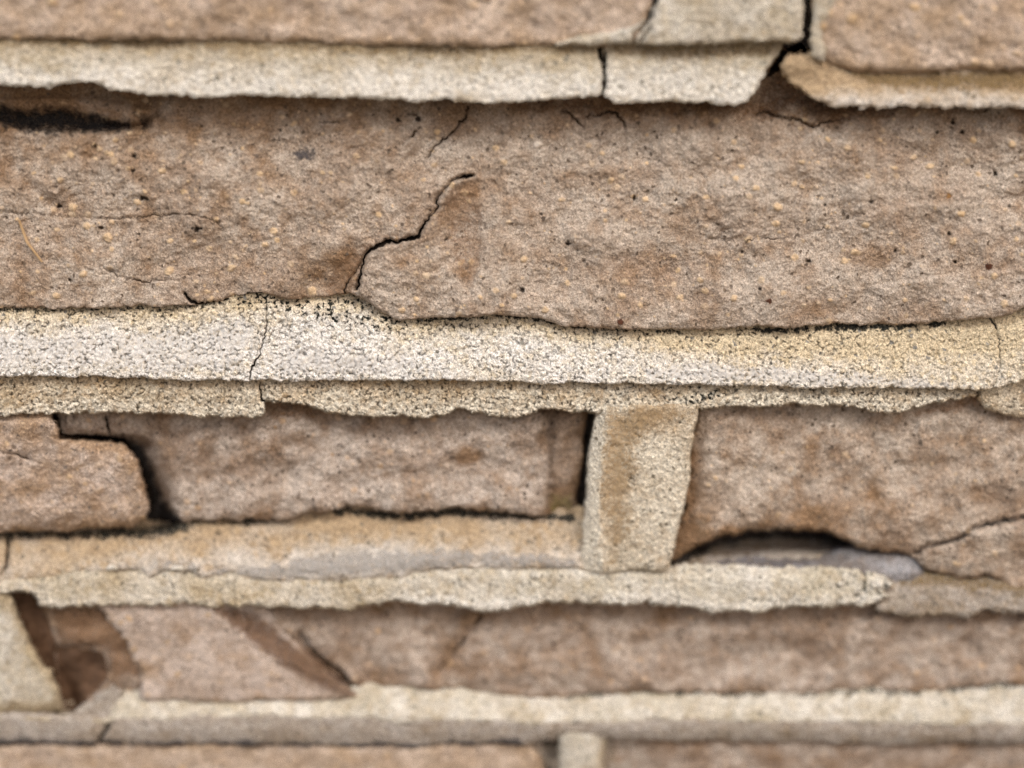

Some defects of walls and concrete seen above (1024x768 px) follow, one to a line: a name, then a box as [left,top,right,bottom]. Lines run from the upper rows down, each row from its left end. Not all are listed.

crack [561,47,625,126]
crack [343,174,473,294]
crack [249,302,267,402]
crack [915,517,1024,554]